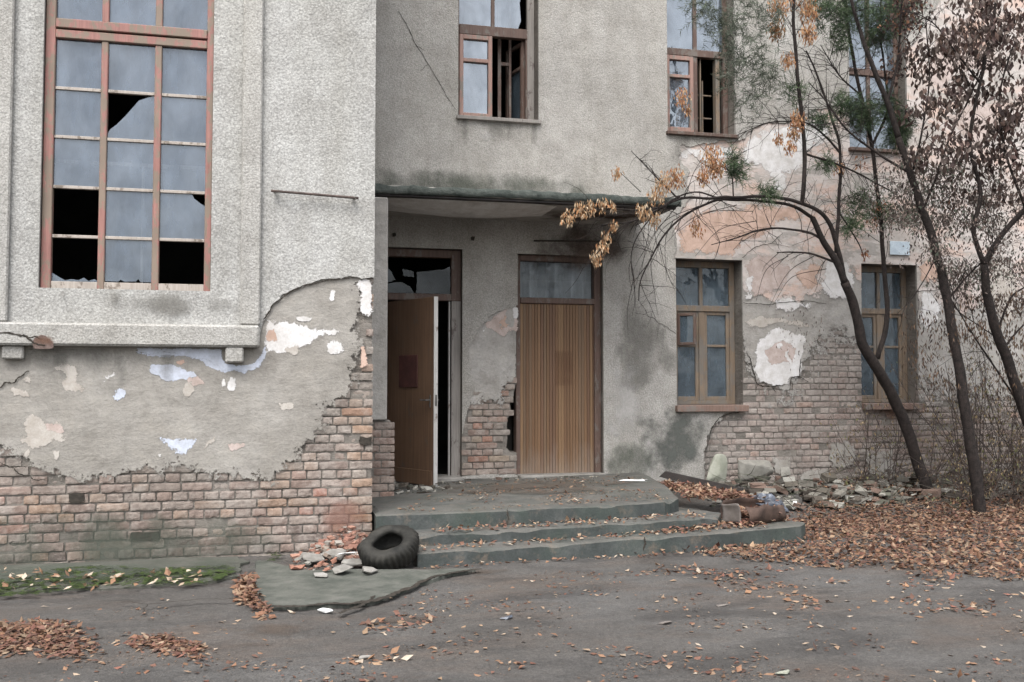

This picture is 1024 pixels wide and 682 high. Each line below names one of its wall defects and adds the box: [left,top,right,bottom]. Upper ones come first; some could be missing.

crack [399,12,454,107]
spalling [673,0,1024,484]
spalling [0,276,395,565]
spalling [461,306,518,475]
damp [646,413,703,470]